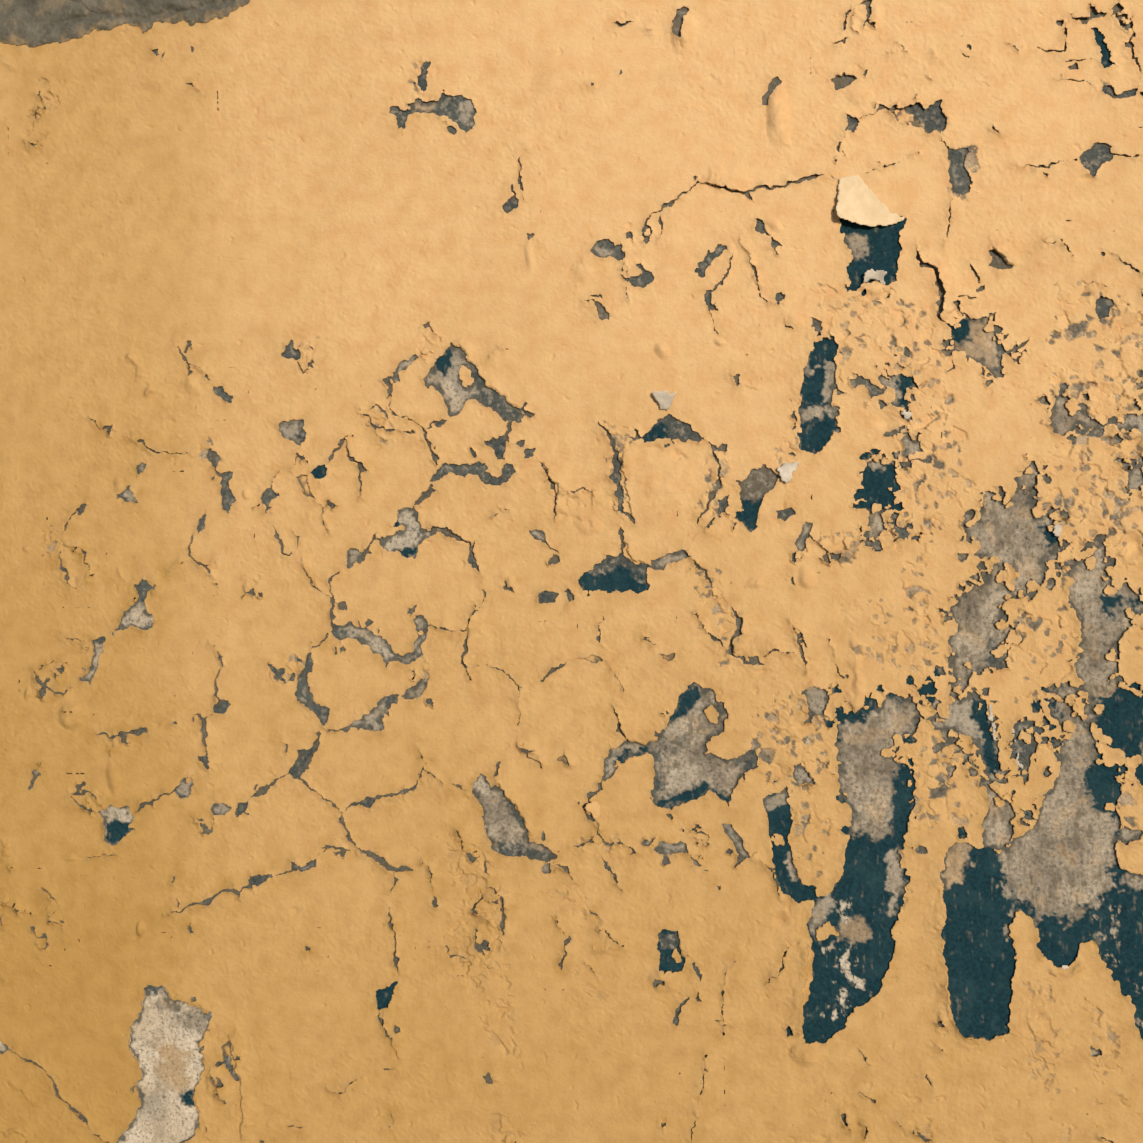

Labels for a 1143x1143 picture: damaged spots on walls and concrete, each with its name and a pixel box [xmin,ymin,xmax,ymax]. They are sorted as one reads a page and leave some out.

peeling [389,56,477,135]
crack [632,173,835,249]
peeling [831,69,980,236]
crack [91,419,236,586]
peeling [253,321,536,559]
crack [388,401,624,755]
crack [694,444,730,536]
peeling [418,148,1143,1069]
crack [96,640,231,798]
crack [162,728,462,1041]
peeling [117,985,243,1143]
peeling [483,1072,502,1084]